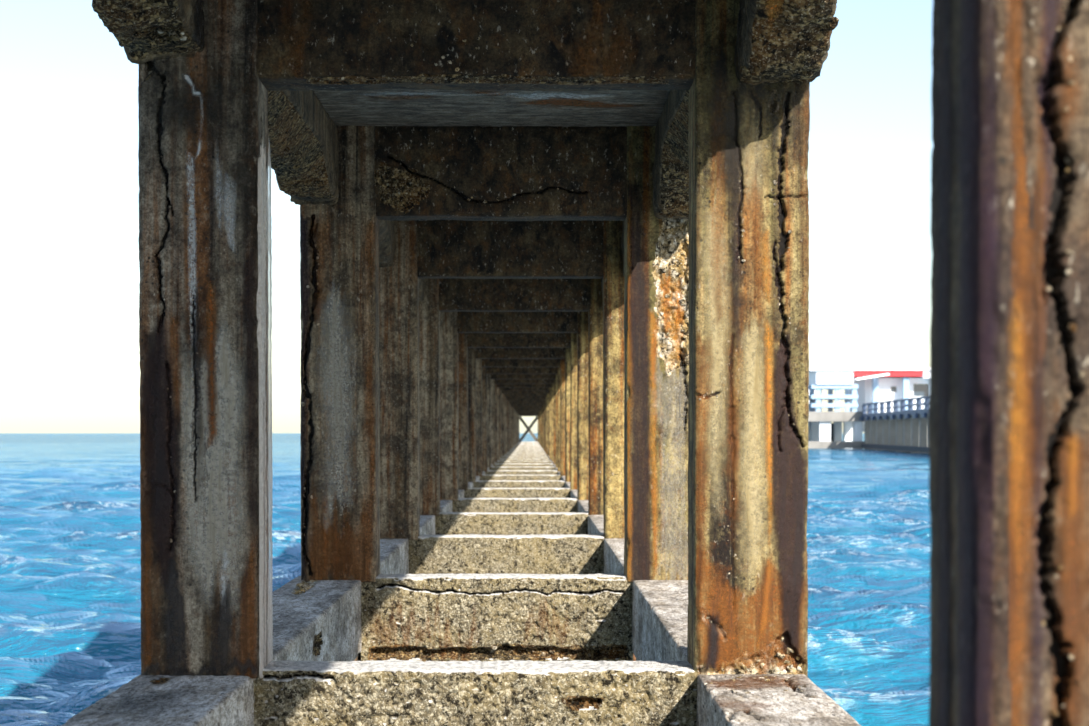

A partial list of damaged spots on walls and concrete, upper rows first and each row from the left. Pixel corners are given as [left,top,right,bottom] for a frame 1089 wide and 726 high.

spalling [92,0,201,88]
spalling [739,0,839,111]
rust [141,417,152,672]
crack [301,215,320,575]
rust [301,215,374,581]
crack [377,584,624,597]
spalling [652,90,689,376]
rust [696,326,808,688]
crack [736,107,801,343]
rust [1009,122,1043,726]
crack [1034,0,1086,726]
rust [1055,436,1086,726]